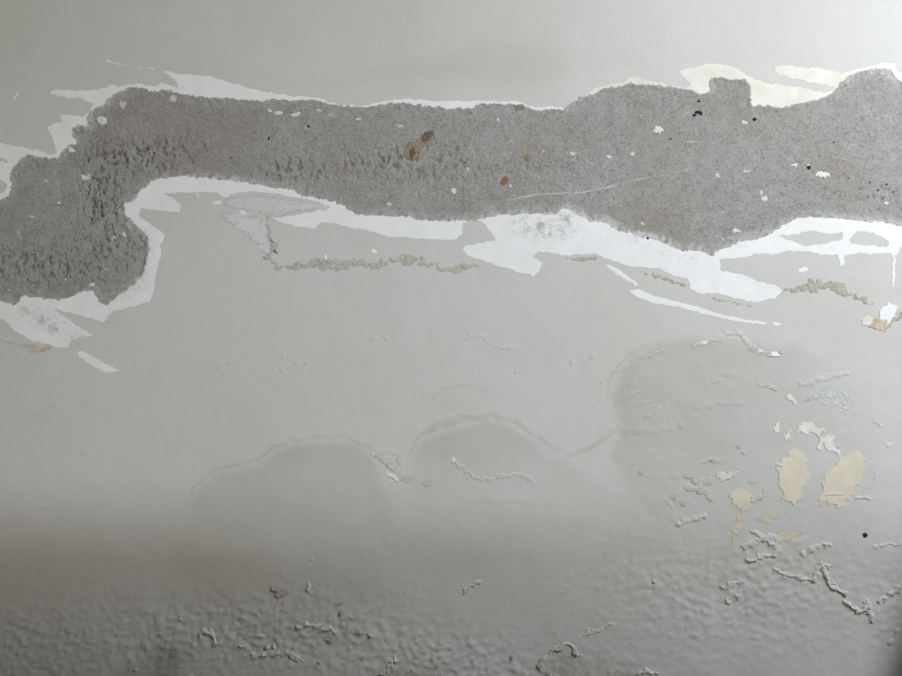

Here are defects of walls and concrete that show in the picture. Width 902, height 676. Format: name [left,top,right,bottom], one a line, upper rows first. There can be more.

corrosion [403,130,434,161]
spalling [0,59,902,373]
peeling [774,421,872,509]